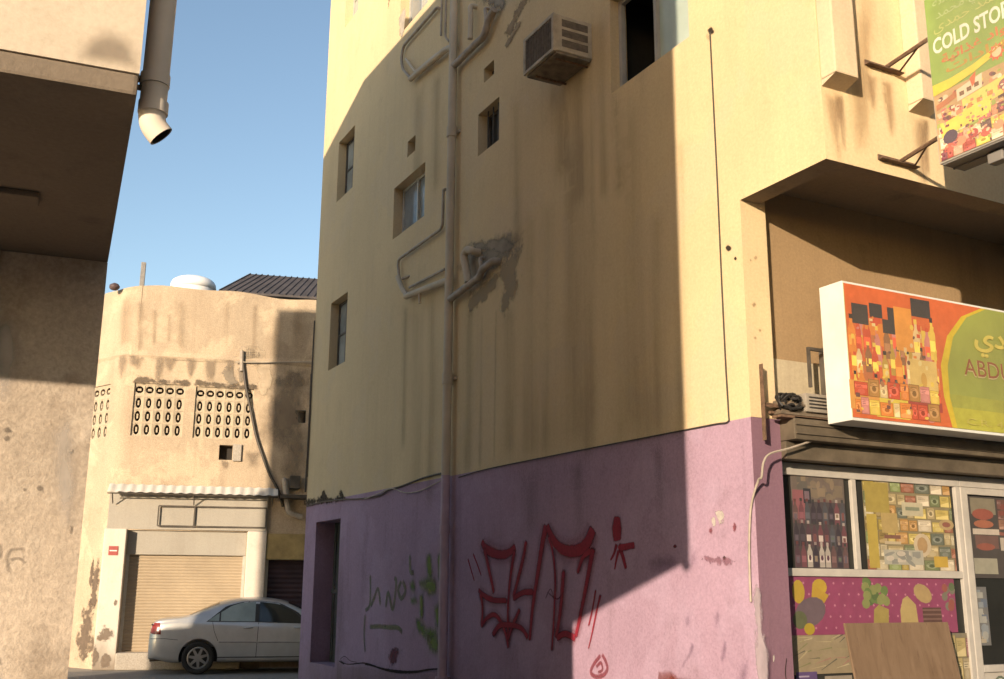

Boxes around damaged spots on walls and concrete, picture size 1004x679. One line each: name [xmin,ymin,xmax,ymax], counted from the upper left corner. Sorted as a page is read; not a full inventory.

peeling [505,0,527,48]
damp [133,359,257,389]
spalling [76,560,99,660]